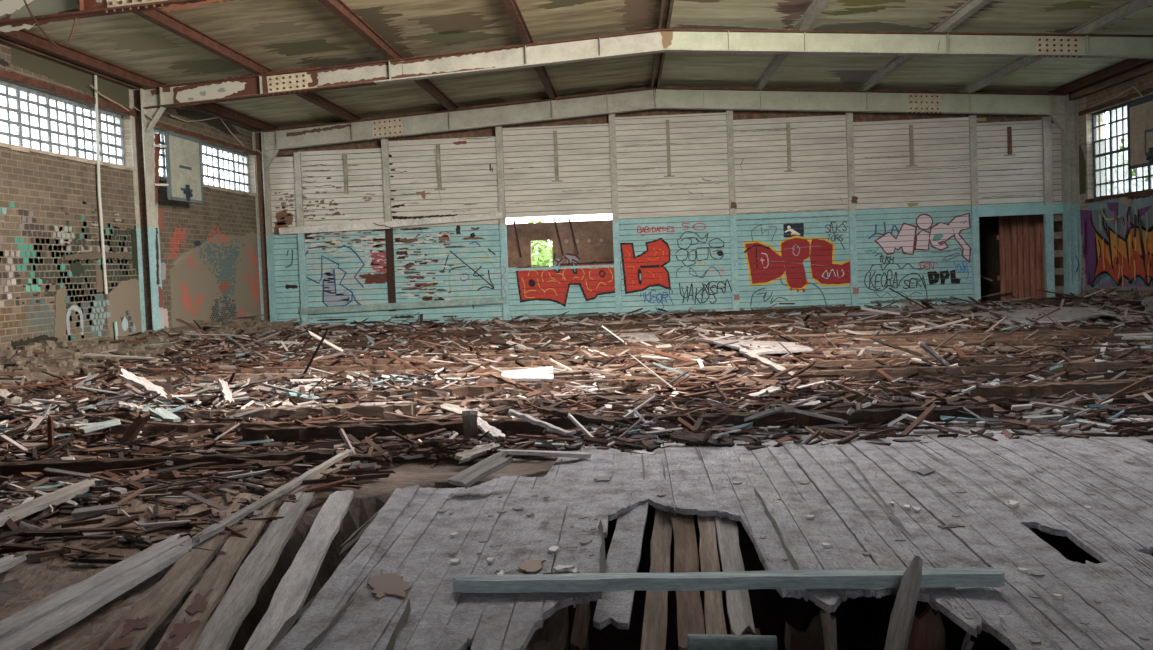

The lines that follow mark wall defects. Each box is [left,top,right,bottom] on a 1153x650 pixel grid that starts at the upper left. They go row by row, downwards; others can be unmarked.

peeling [274,185,511,305]